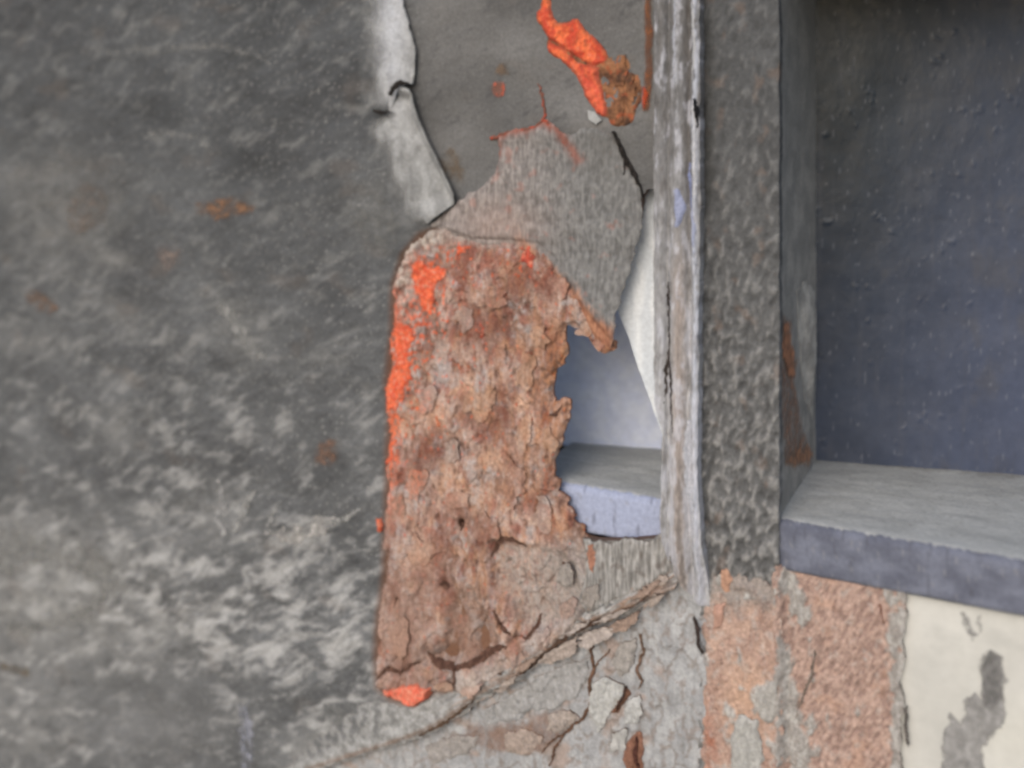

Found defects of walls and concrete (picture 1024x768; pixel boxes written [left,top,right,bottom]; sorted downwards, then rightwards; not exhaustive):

peeling [368,0,643,350]
crack [611,131,644,198]
rust [375,229,618,707]
peeling [286,533,678,768]
crack [542,646,610,767]
crack [635,634,646,689]